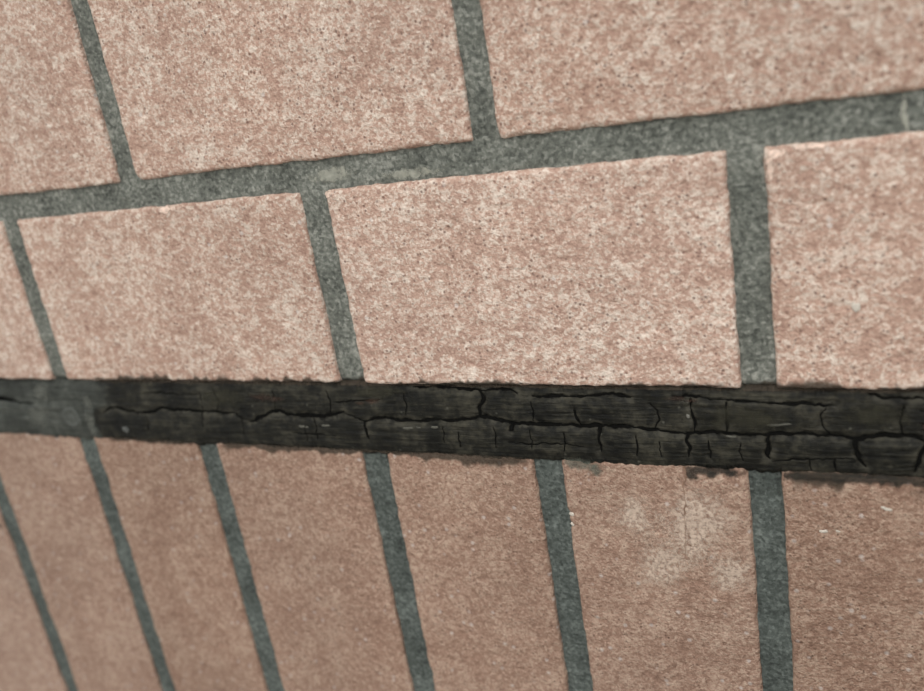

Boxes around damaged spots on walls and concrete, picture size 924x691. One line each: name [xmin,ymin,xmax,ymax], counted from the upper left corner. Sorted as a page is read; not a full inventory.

crack [103,385,924,552]